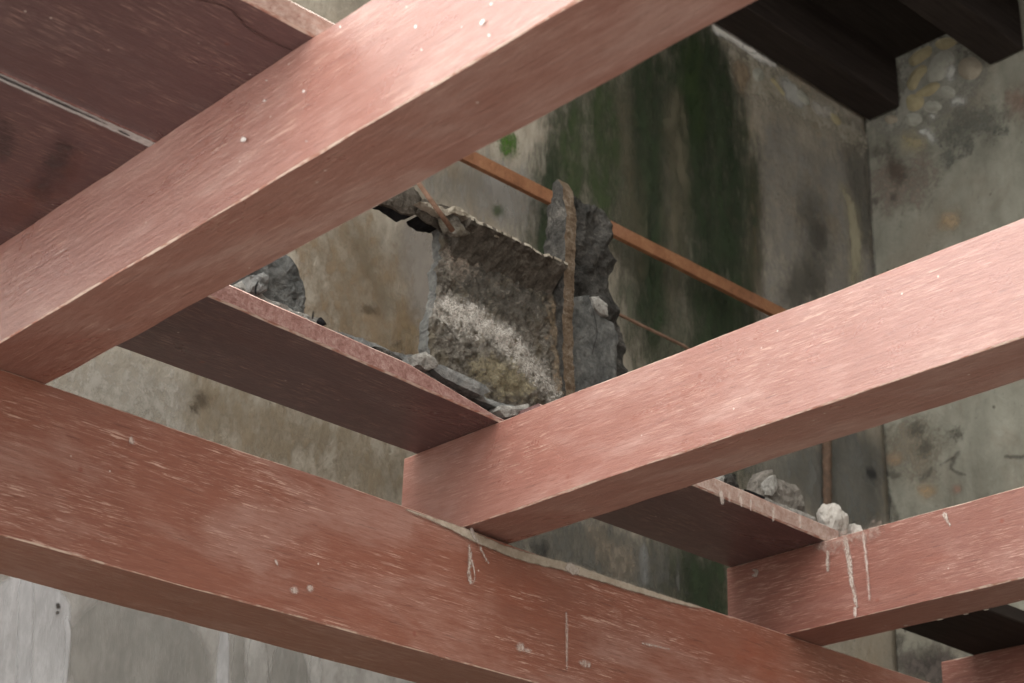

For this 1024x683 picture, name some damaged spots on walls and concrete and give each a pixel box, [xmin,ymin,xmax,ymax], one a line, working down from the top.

water stain [712,23,776,66]
water stain [787,126,869,305]
peeling [589,296,608,318]
water stain [748,433,883,567]
water stain [517,518,687,598]
water stain [844,537,857,617]